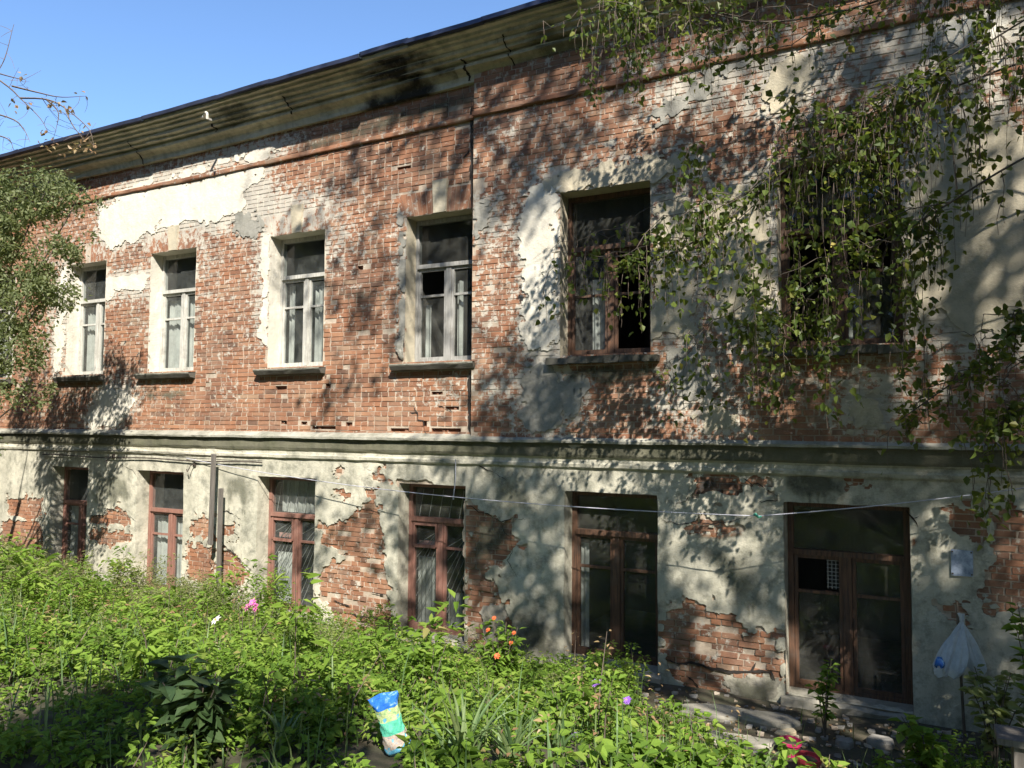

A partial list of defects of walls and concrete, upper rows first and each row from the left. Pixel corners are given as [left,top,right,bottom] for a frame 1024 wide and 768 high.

flaking render [98,147,281,347]
flaking render [473,199,493,245]
flaking render [517,148,777,441]
spalling [0,493,47,554]
spalling [87,506,133,549]
spalling [185,513,252,587]
spalling [317,466,393,640]
spalling [462,501,527,649]
spalling [686,473,774,496]
spalling [938,497,1024,627]
spalling [658,597,789,695]